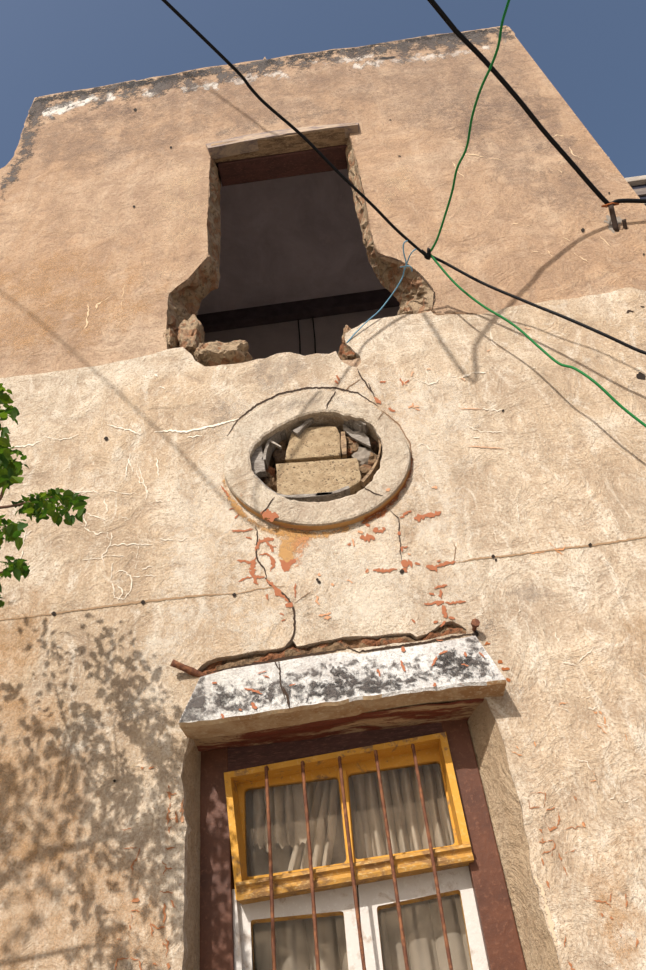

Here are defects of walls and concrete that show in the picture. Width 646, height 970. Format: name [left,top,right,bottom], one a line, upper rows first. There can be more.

leakage [0,26,516,192]
spalling [163,157,253,366]
spalling [346,135,434,315]
spalling [338,325,357,360]
crack [227,369,432,487]
peeling [355,371,482,460]
rust [222,458,413,566]
crack [0,460,471,708]
mould [179,638,494,722]